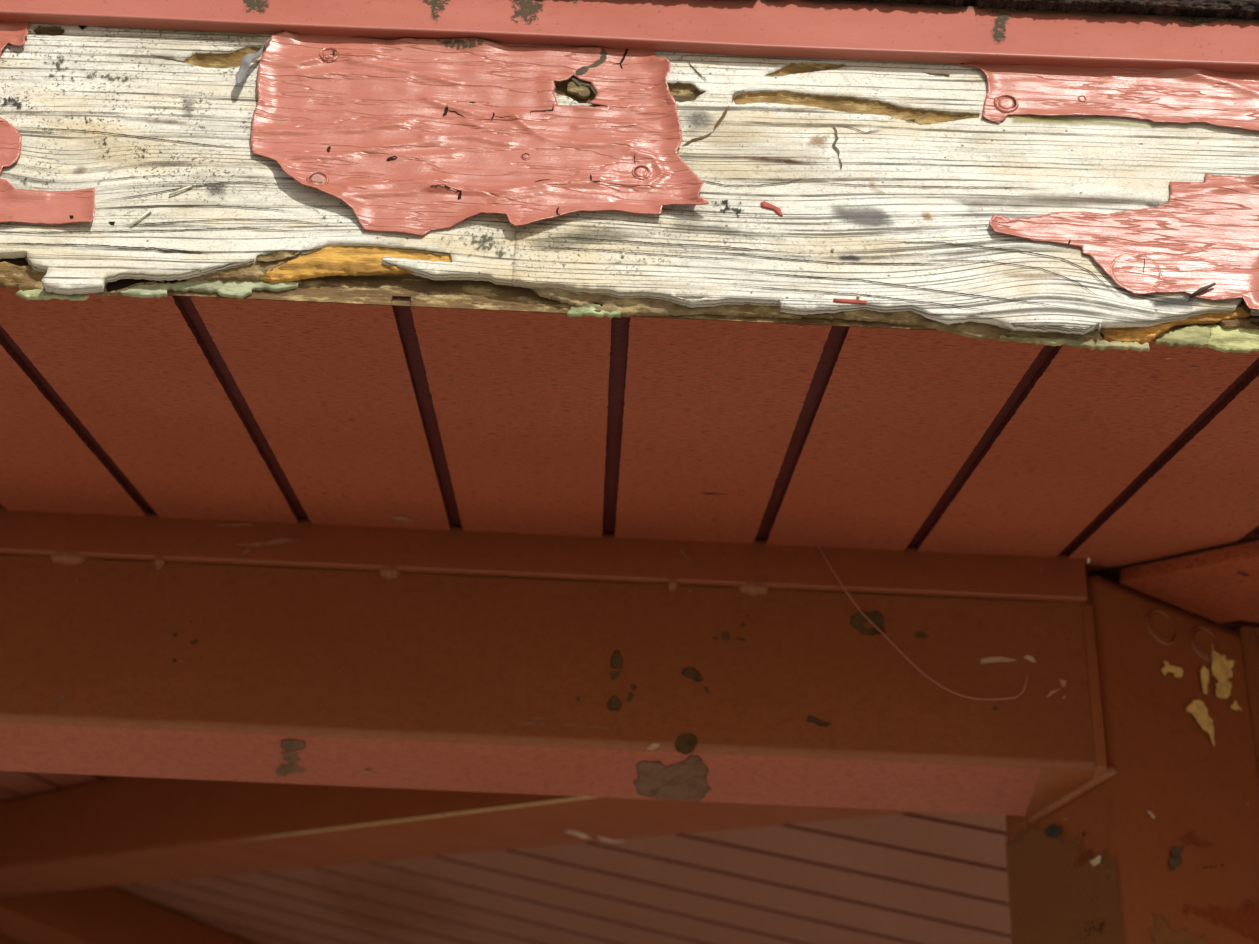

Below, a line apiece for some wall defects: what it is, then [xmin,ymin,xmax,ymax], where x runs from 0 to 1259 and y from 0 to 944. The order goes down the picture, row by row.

peeling [0,22,1259,359]
peeling [1161,660,1183,678]
peeling [1186,644,1242,747]
peeling [275,739,308,776]
peeling [633,733,711,802]